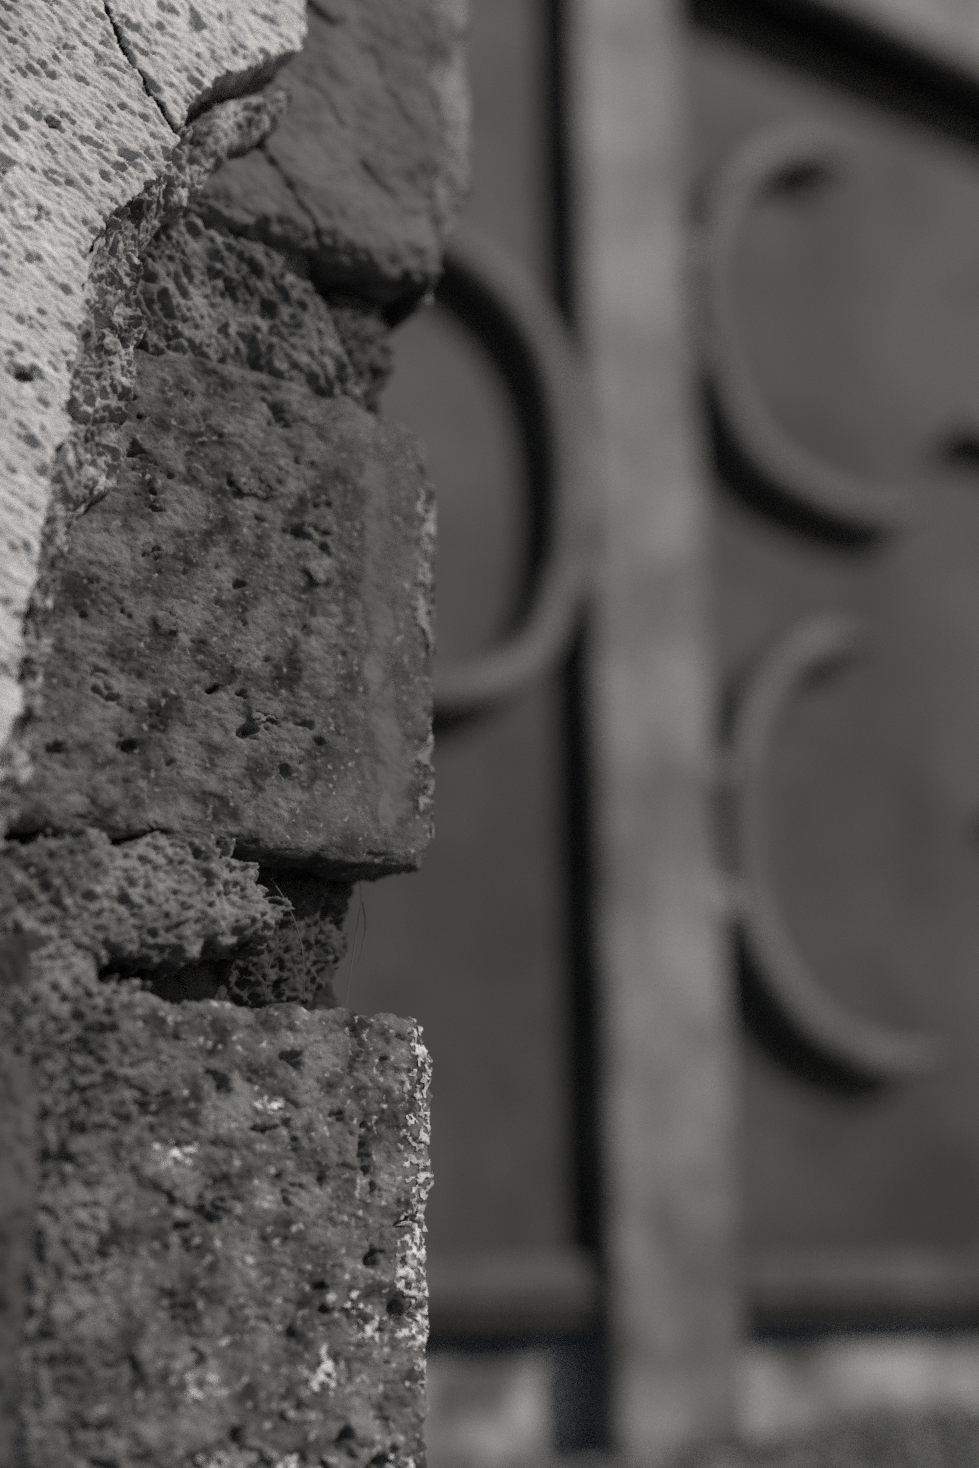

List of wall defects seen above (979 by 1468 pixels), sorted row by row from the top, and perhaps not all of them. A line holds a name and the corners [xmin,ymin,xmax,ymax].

crack [102,0,181,134]
spalling [0,87,361,862]
spalling [412,482,438,659]
spalling [416,715,435,849]
spalling [96,969,187,1006]
spalling [307,961,338,1011]